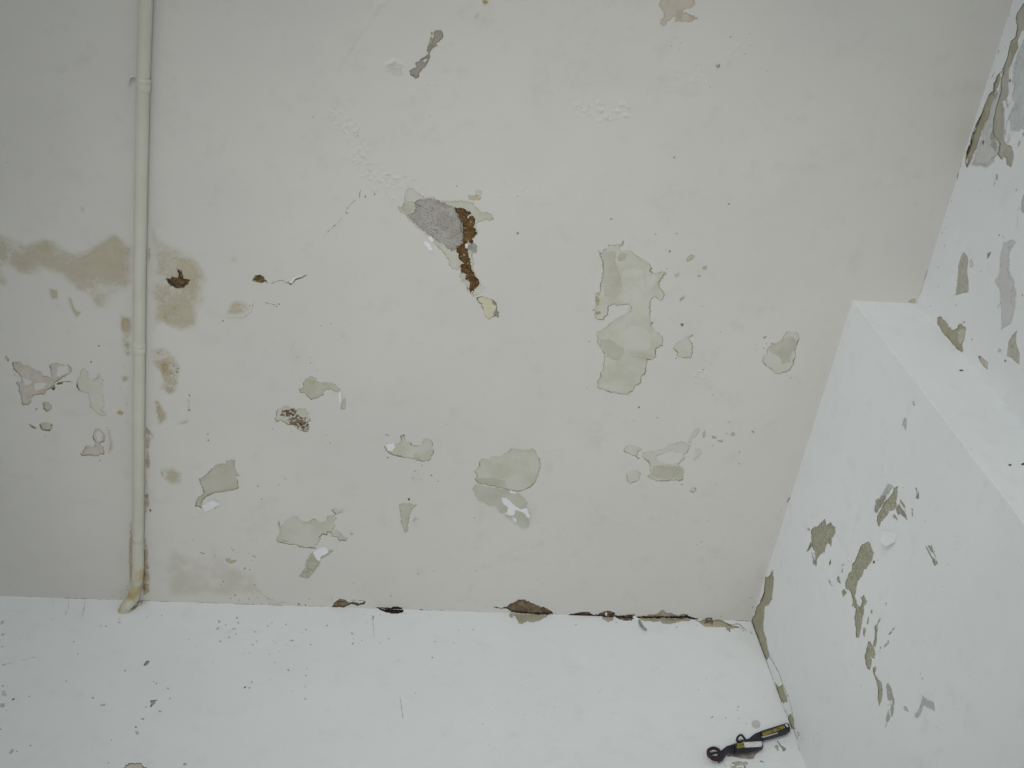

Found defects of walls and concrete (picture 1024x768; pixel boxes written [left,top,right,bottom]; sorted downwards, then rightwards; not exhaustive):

spalling [409,30,443,79]
peeling [965,3,1024,167]
damp [160,259,199,325]
spalling [397,188,499,319]
peeling [593,241,693,395]
spalling [275,376,346,432]
peeling [472,448,541,527]
peeling [874,485,913,526]
spalling [332,599,404,614]
spalling [495,599,553,624]
peeling [807,519,895,706]
peeling [602,570,800,751]